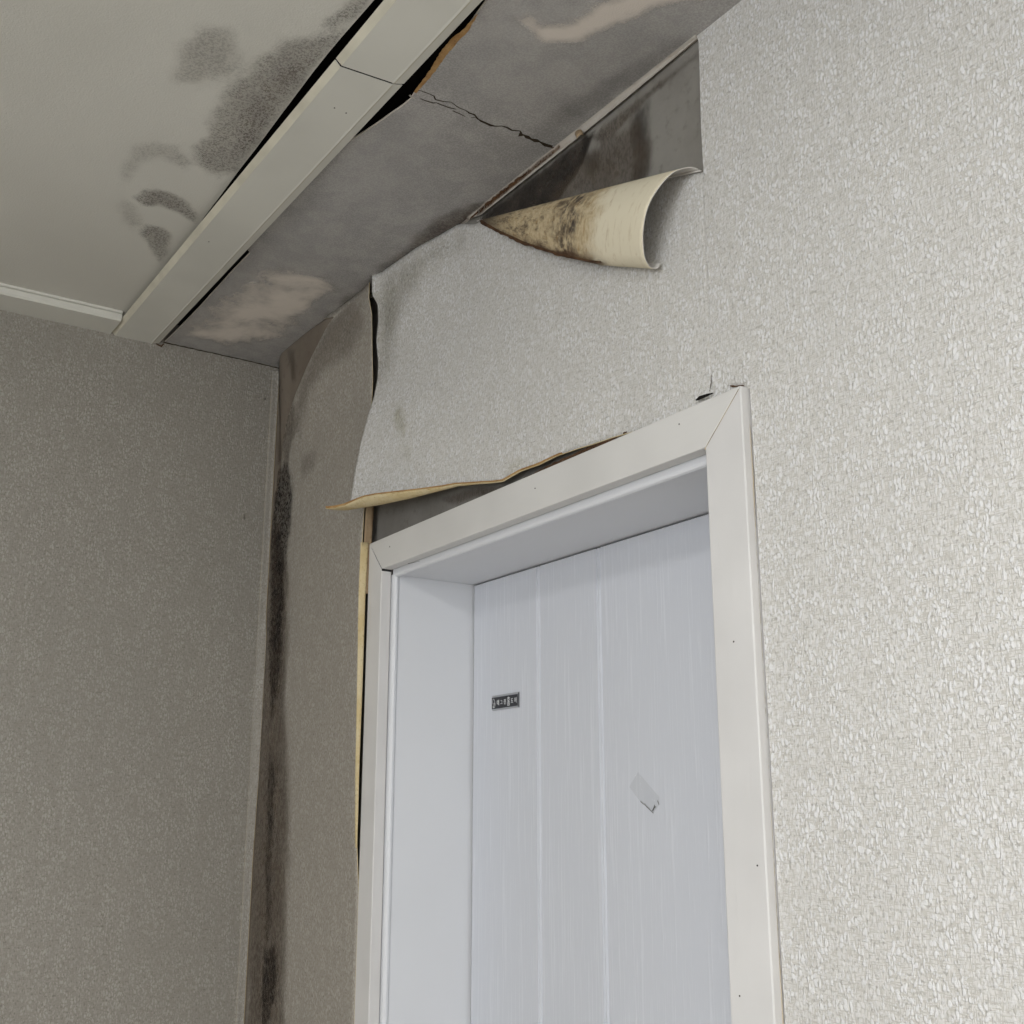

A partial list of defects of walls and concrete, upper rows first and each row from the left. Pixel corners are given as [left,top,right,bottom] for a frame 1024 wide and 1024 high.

water stain [165,0,741,367]
crack [418,90,554,148]
flaking render [465,40,703,224]
flaking render [379,444,595,540]
water stain [248,465,292,1024]